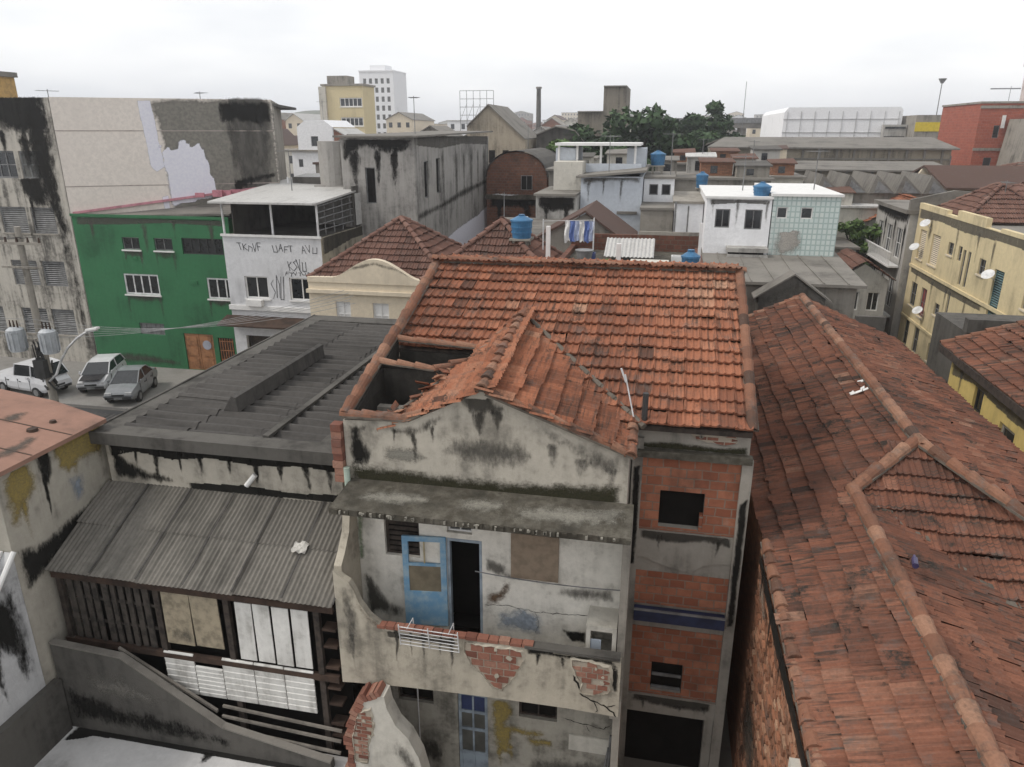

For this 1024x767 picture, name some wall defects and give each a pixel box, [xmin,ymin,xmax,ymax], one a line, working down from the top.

peeling [151,99,245,217]
water stain [219,102,270,159]
water stain [343,139,410,184]
water stain [0,97,222,324]
water stain [109,445,335,488]
water stain [351,427,370,464]
water stain [23,510,85,587]
water stain [0,595,29,674]
spalling [462,641,525,691]
crack [565,675,616,731]
spalling [569,657,613,698]
spalling [351,708,375,764]